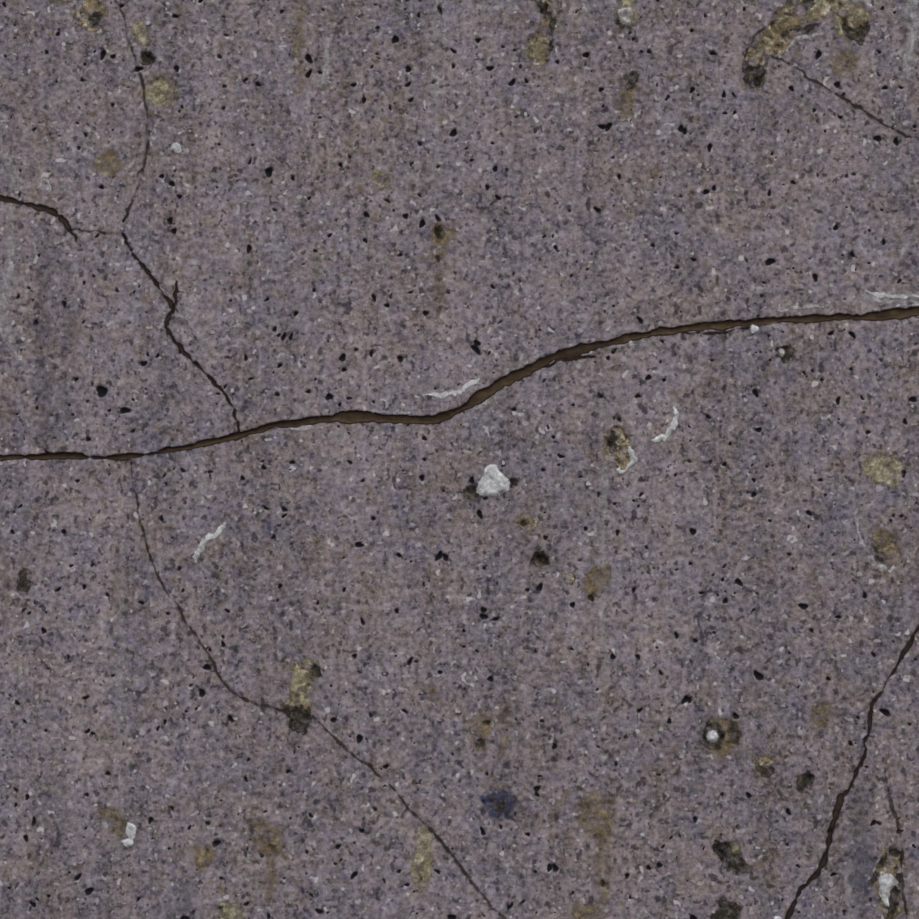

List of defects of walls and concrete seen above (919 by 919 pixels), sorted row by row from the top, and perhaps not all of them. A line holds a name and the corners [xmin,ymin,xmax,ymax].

crack [0,45,919,591]
crack [177,603,505,918]
crack [773,625,919,919]